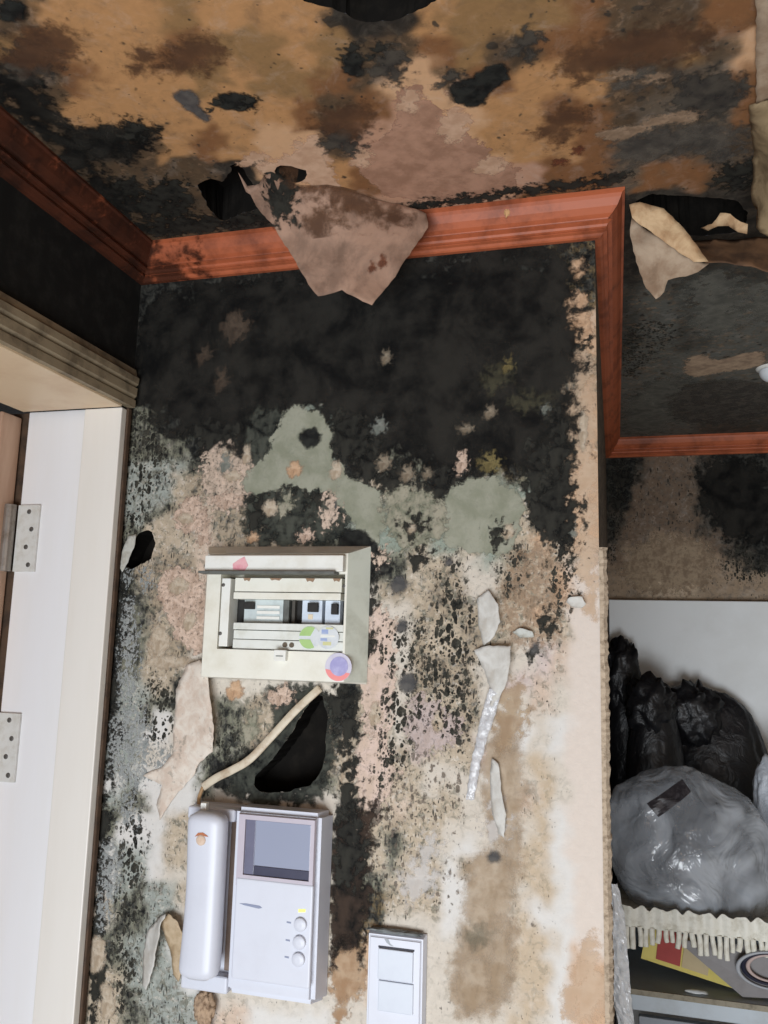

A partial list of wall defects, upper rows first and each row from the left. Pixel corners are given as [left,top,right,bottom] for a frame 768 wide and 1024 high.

peeling [236,135,340,187]
leakage [401,21,754,210]
leakage [0,0,596,1024]
leakage [607,454,768,600]
spalling [105,530,206,829]
spalling [254,682,328,793]
leakage [561,936,605,1023]